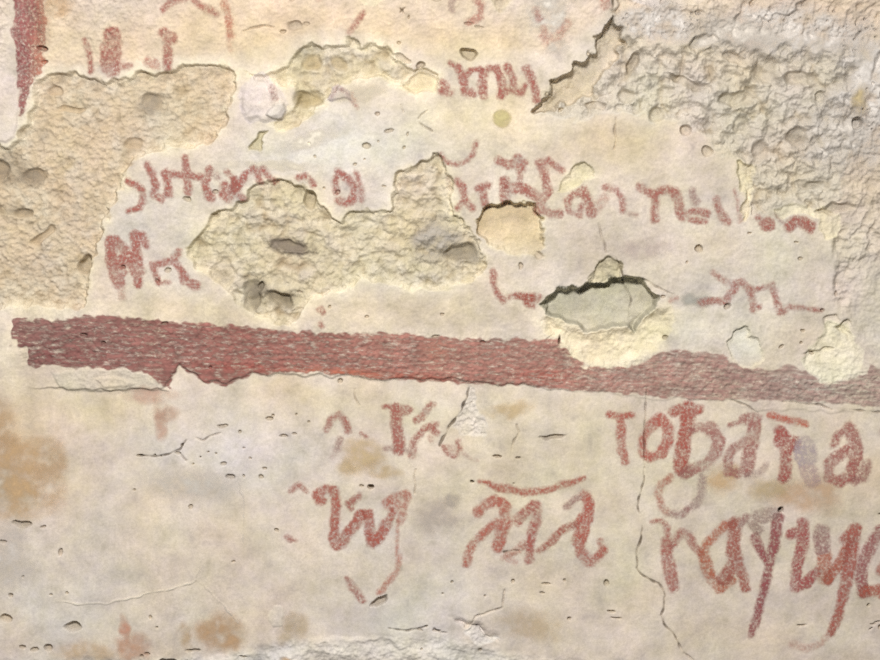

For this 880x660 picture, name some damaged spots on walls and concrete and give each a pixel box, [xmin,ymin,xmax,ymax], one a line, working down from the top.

flaking render [530,14,871,242]
flaking render [0,34,443,315]
flaking render [182,150,548,329]
flaking render [535,252,679,371]
flaking render [798,308,866,387]
spalling [10,520,46,529]
spalling [19,644,53,653]
spalling [62,621,83,633]
spalling [140,648,202,660]